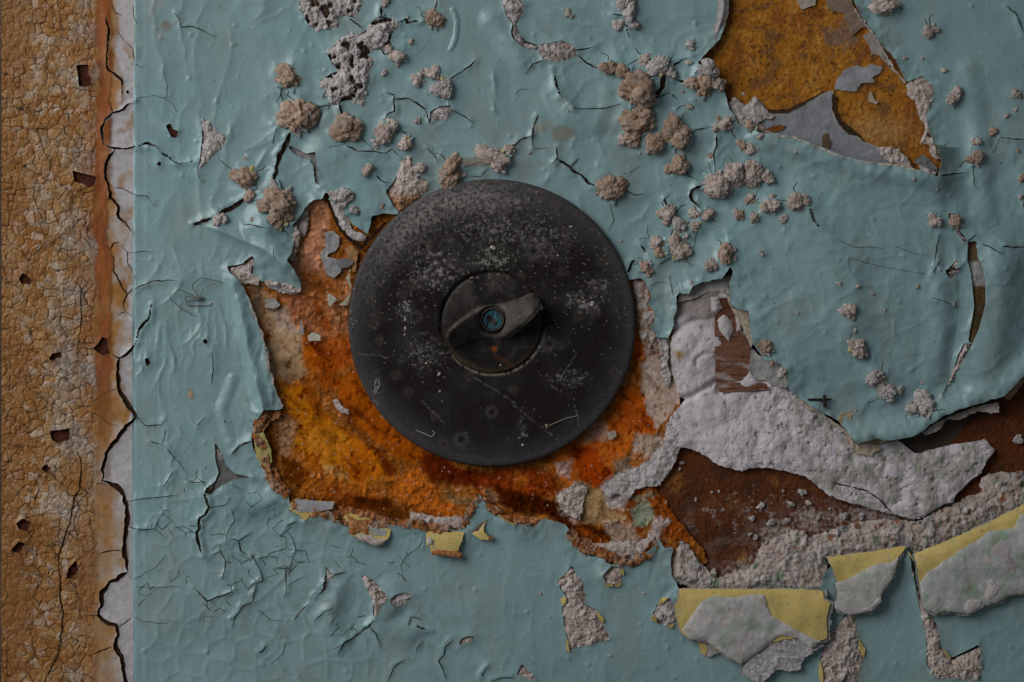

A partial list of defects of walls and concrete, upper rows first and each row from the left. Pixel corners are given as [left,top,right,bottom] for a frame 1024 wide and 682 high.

corrosion [91,0,113,406]
spalling [198,119,226,169]
spalling [298,0,401,106]
crack [385,61,474,122]
spalling [538,41,576,62]
peeling [698,0,941,176]
crack [44,0,452,682]
spalling [228,156,995,587]
corrosion [656,382,1024,589]
peeling [922,377,1024,435]
spalling [558,566,610,652]
peeling [651,505,1024,682]